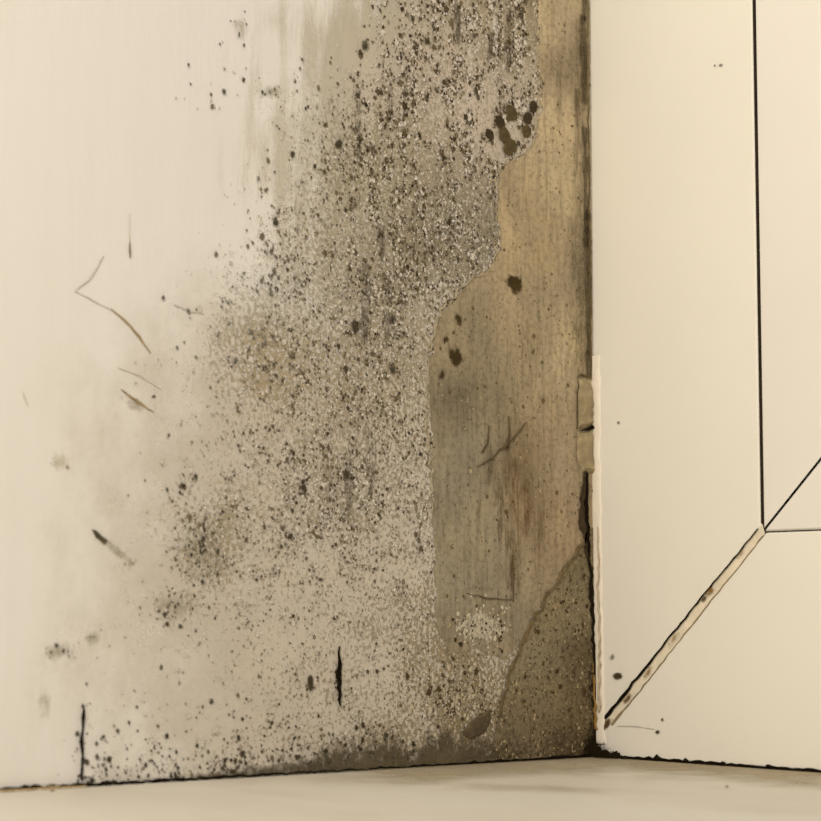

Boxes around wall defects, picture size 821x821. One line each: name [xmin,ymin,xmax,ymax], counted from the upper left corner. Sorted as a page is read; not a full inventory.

crack [585,0,593,377]
water stain [136,0,821,781]
peeling [424,0,594,764]
water stain [77,752,131,783]
crack [0,471,596,792]